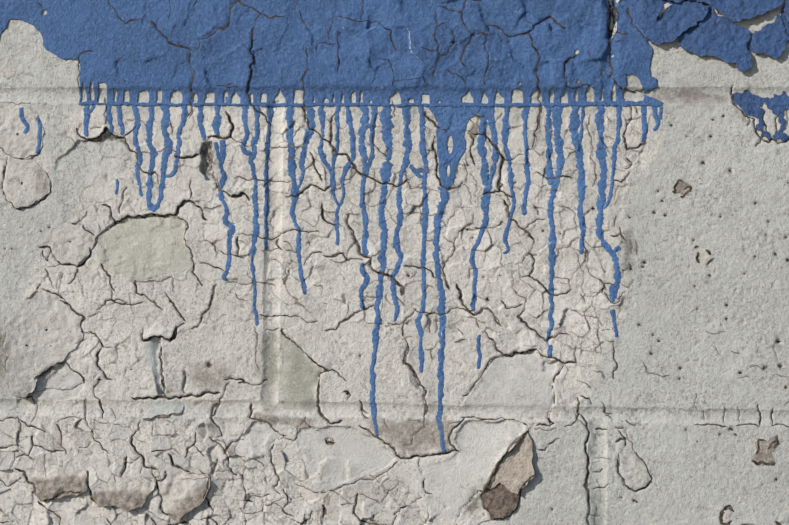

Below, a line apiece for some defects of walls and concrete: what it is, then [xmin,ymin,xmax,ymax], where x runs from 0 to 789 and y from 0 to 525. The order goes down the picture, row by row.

peeling [641,0,789,72]
peeling [731,89,789,141]
peeling [40,214,190,279]
crack [0,7,638,525]
peeling [3,288,85,401]
peeling [418,350,557,523]
crack [565,380,653,525]
spalling [751,435,779,466]
peeling [28,466,210,523]
crack [720,505,754,525]